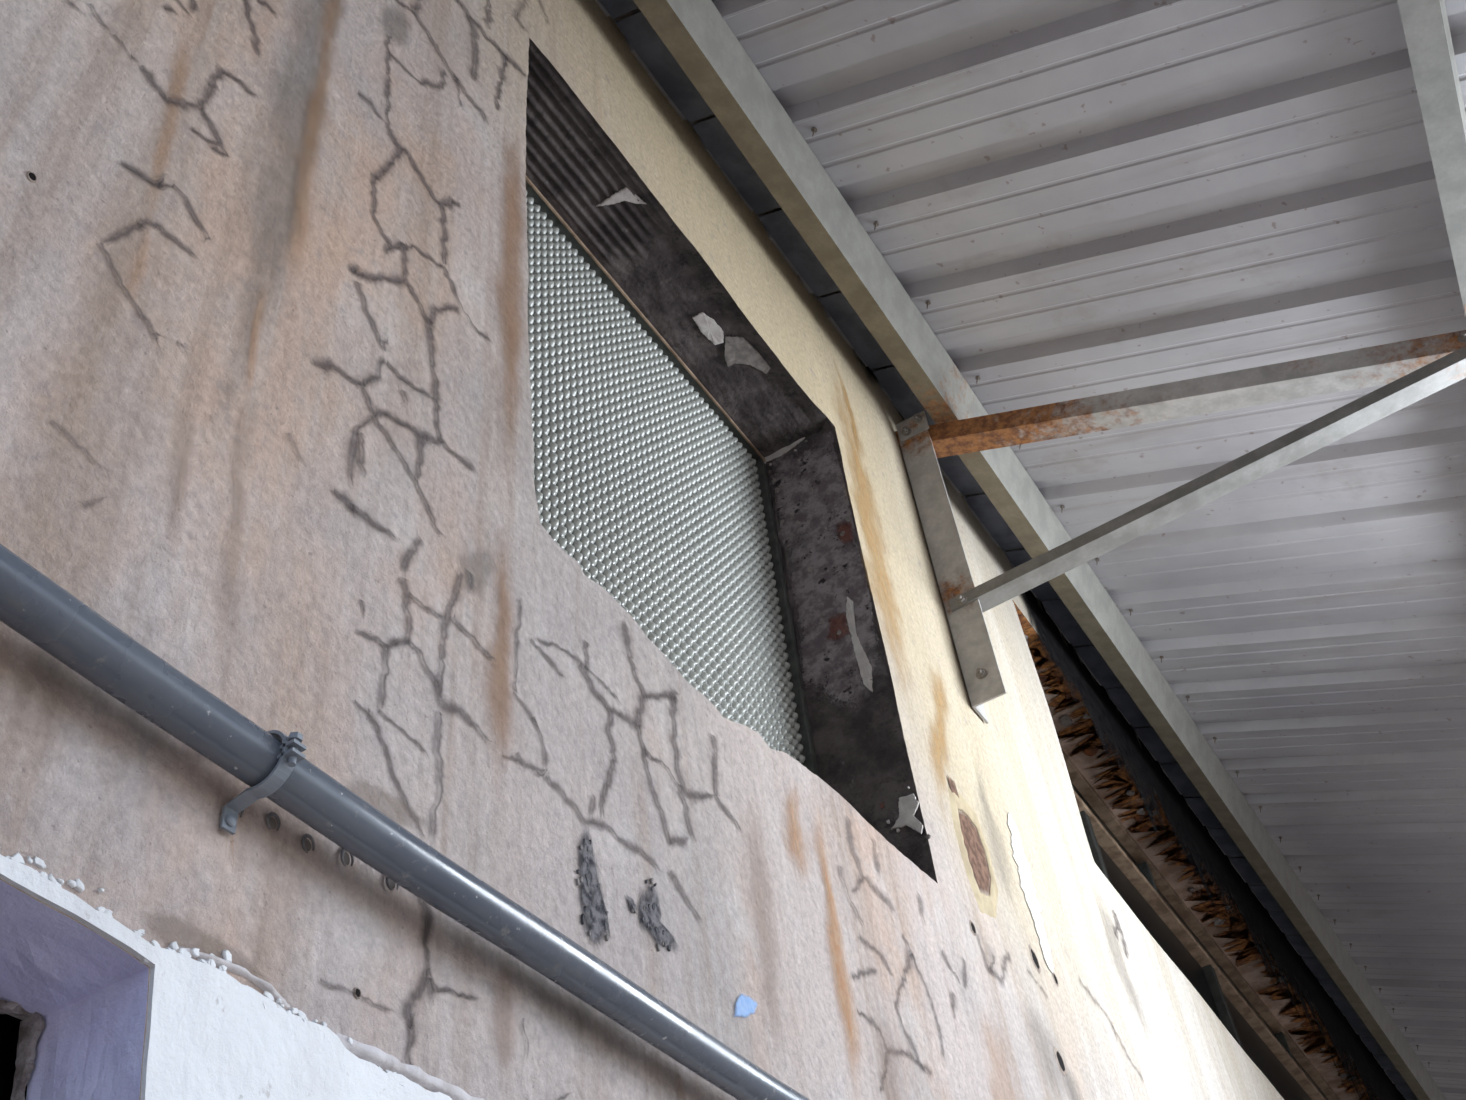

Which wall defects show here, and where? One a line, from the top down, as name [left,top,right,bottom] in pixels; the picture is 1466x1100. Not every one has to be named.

crack [70,0,274,156]
crack [101,163,210,341]
crack [313,0,741,919]
flaking render [0,1000,45,1100]
peeling [5,853,113,918]
peeling [132,929,232,973]
peeling [263,991,327,1039]
crack [366,900,476,1065]
corrosion [823,858,853,1044]
crack [849,821,1000,1089]
flaking render [948,777,998,918]
corrosion [1012,600,1371,1100]